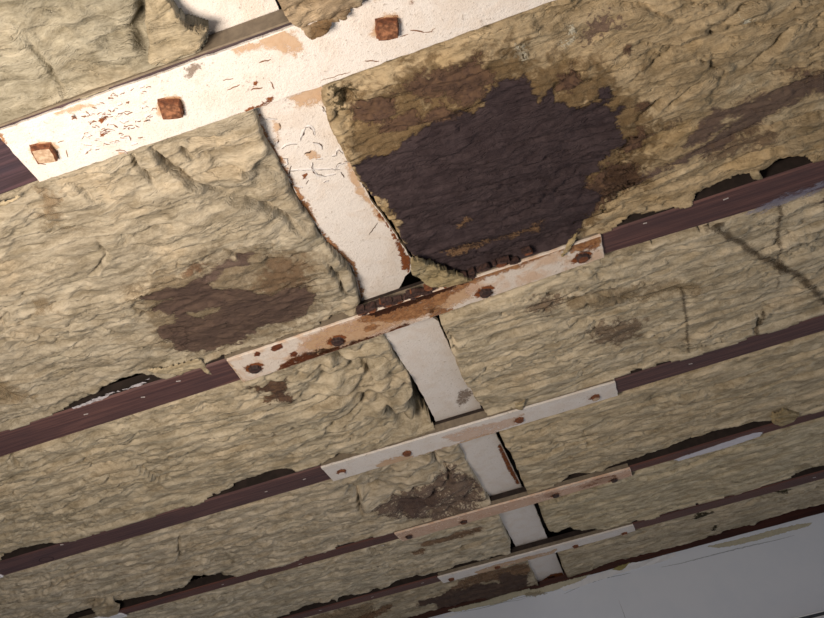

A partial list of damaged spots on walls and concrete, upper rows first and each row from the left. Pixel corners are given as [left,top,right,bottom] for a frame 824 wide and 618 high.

water stain [309,12,340,40]
water stain [560,7,627,48]
water stain [328,38,824,274]
rust [228,96,601,407]
water stain [140,252,316,352]
water stain [370,462,486,521]
rust [498,444,520,484]